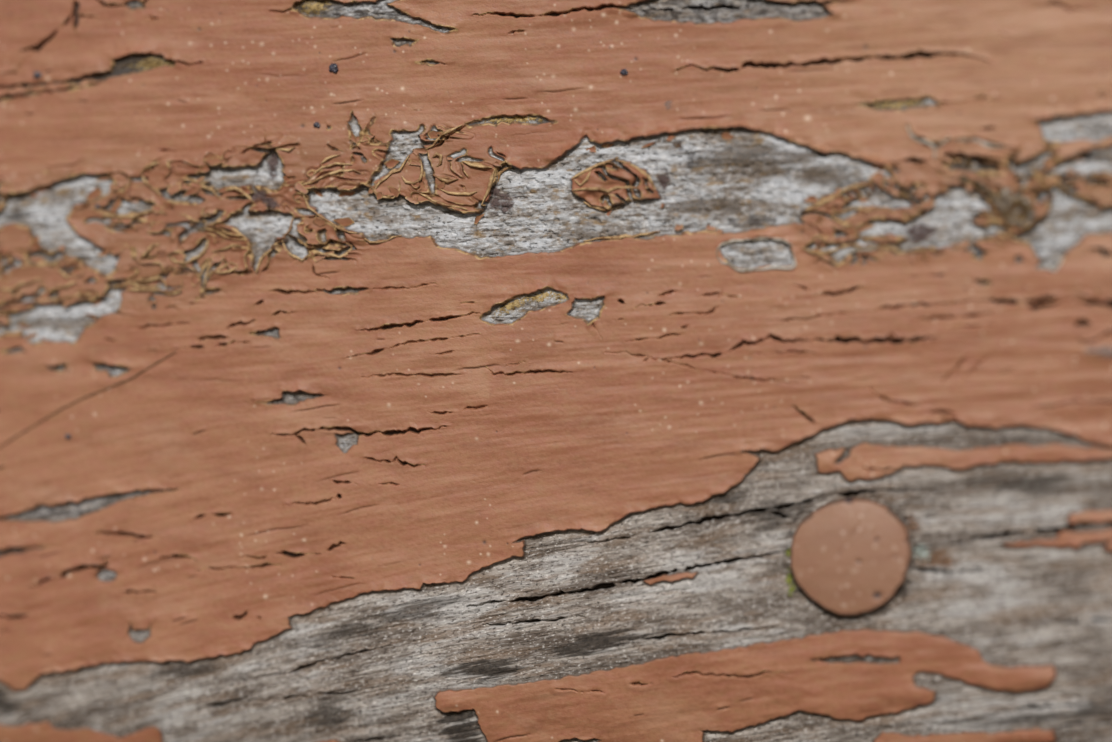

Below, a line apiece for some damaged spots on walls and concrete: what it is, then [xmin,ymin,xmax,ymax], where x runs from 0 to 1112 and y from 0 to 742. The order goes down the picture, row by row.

peeling [0,50,179,104]
peeling [288,0,461,69]
peeling [615,0,857,29]
crack [676,50,988,74]
peeling [0,94,1112,358]
peeling [44,361,71,375]
crack [346,302,573,380]
crack [591,284,1112,426]
crack [270,404,490,507]
crack [586,466,943,545]
peeling [0,415,1112,742]
crack [466,550,790,627]